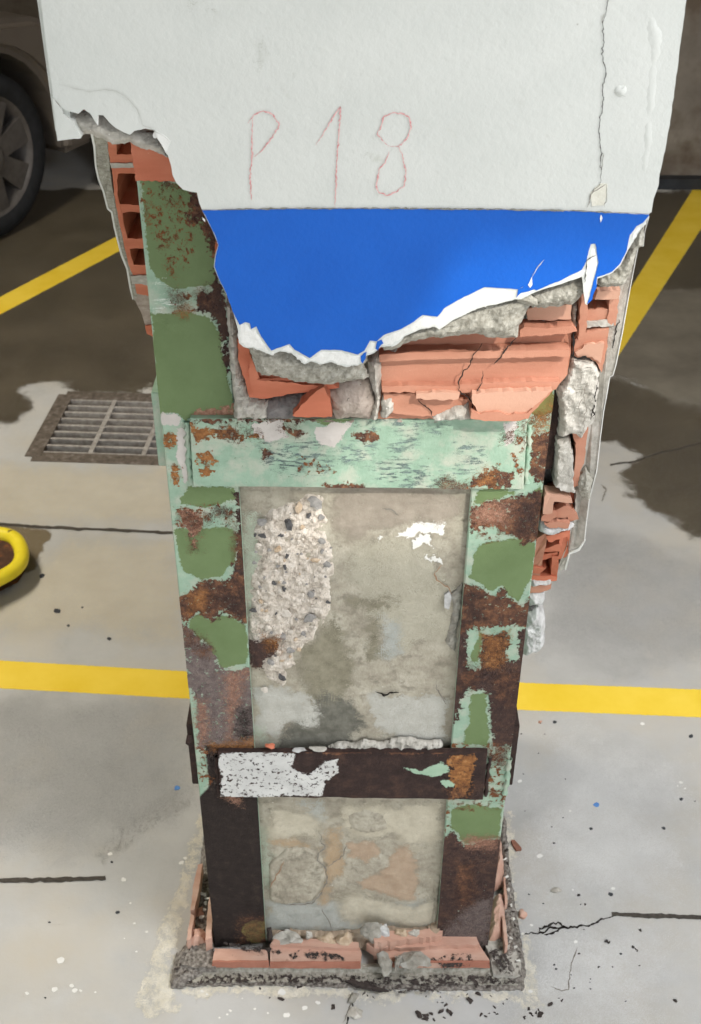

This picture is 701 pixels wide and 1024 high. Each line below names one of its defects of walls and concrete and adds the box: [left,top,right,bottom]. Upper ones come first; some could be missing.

flaking render [72,110,171,158]
crack [587,0,626,207]
corrosion [140,181,232,383]
spalling [248,494,334,693]
peeling [396,521,446,564]
flaking render [238,221,647,384]
crack [458,337,517,408]
corrosion [430,400,553,546]
damp [600,230,701,541]
damp [631,190,692,287]
corrosion [174,491,350,947]
corrosion [385,583,531,951]